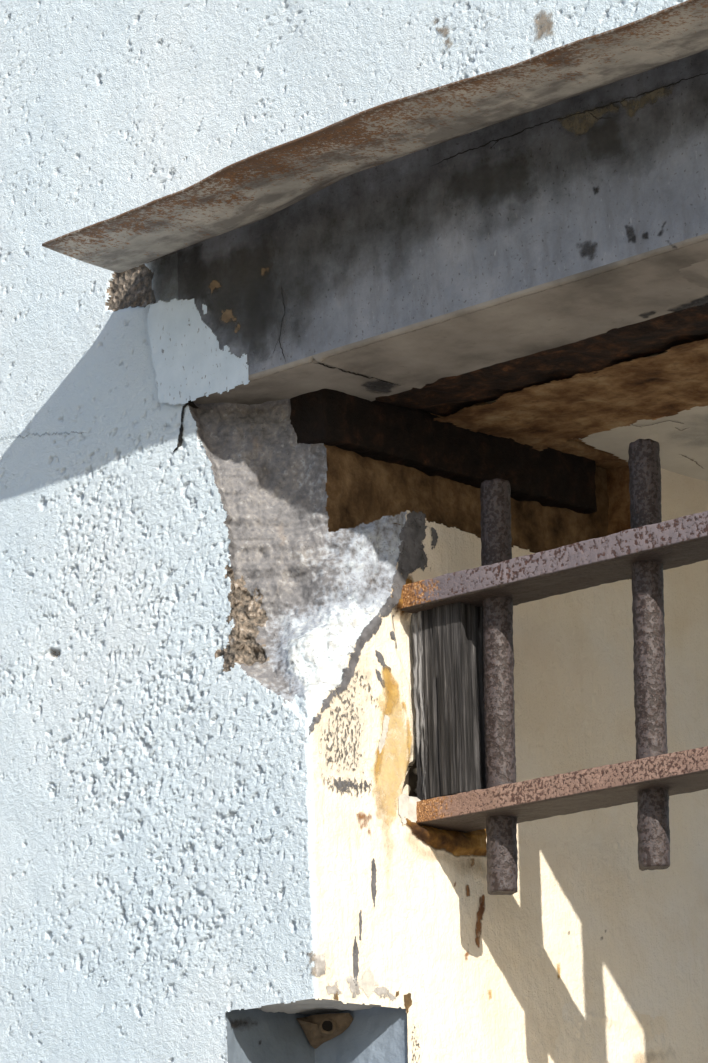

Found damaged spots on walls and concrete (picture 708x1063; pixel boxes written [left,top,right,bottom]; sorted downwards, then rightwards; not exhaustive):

crack [432,73,707,166]
water stain [150,101,651,342]
water stain [625,222,676,248]
water stain [363,380,395,393]
spalling [105,264,481,734]
spalling [510,465,631,553]
corrosion [392,577,414,615]
corrosion [374,668,487,868]
corrosion [454,883,485,959]
peeling [308,952,421,1063]